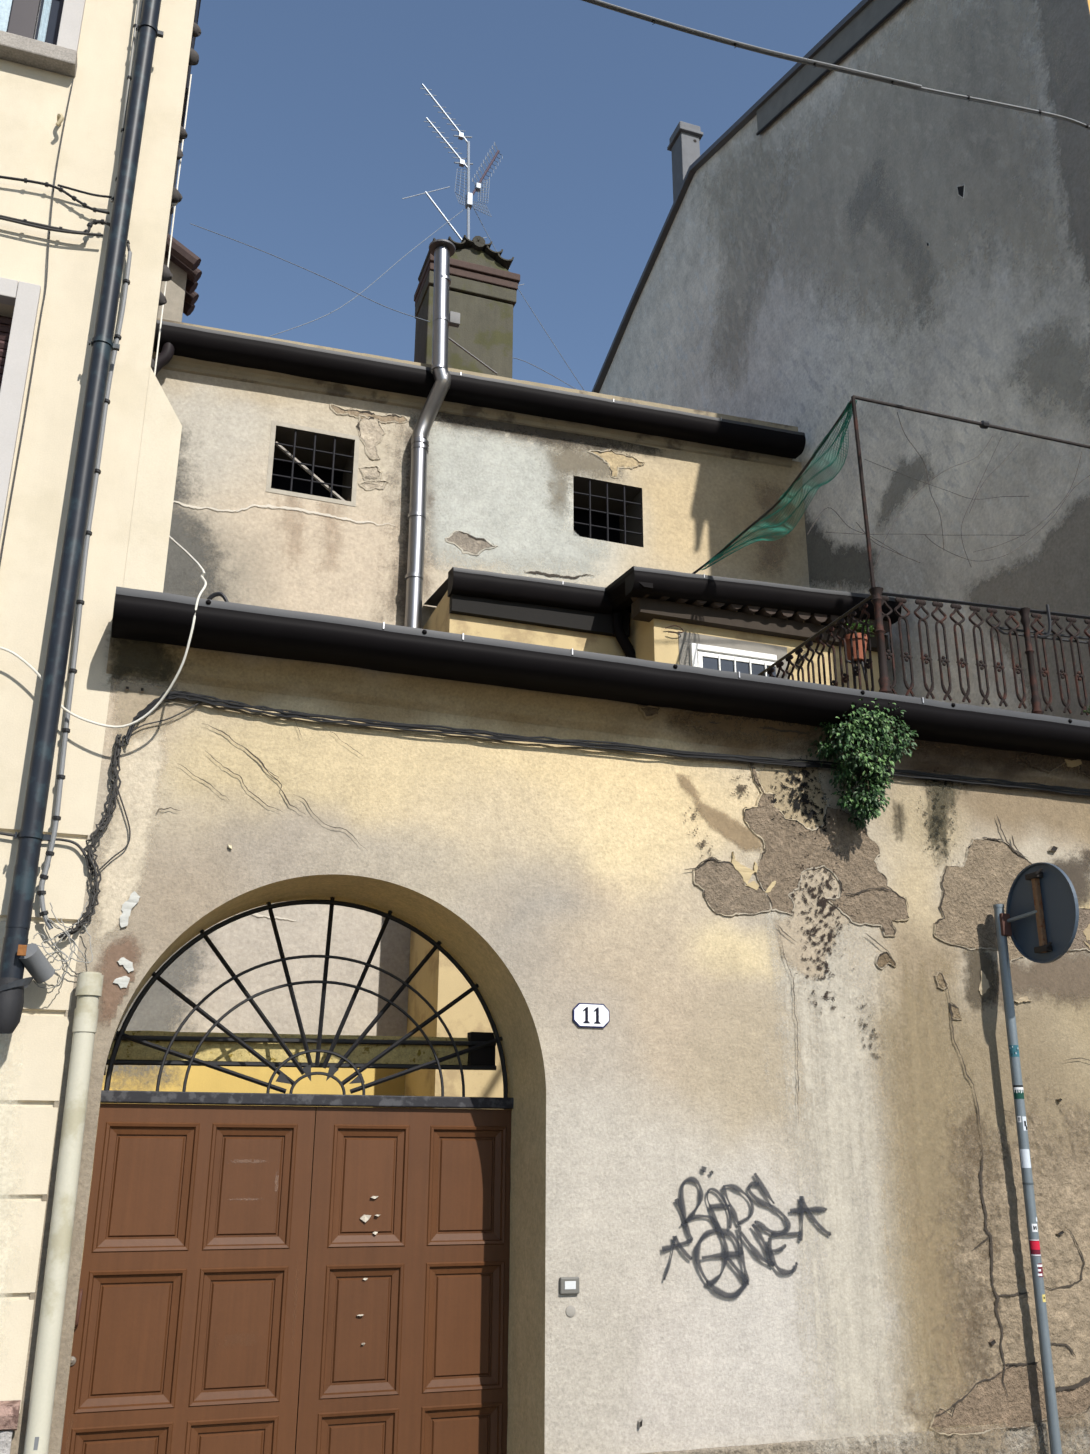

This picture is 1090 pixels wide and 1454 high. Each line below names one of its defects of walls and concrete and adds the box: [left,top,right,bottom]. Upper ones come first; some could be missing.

damp [151,0,197,365]
damp [163,434,222,599]
flaking render [445,530,498,556]
damp [804,512,875,590]
damp [878,456,933,526]
crack [179,723,366,849]
flaking render [692,762,910,970]
damp [894,770,967,878]
flaking render [932,837,1032,963]
flaking render [978,970,990,995]
flaking render [1067,906,1090,953]
crack [936,974,1090,1416]